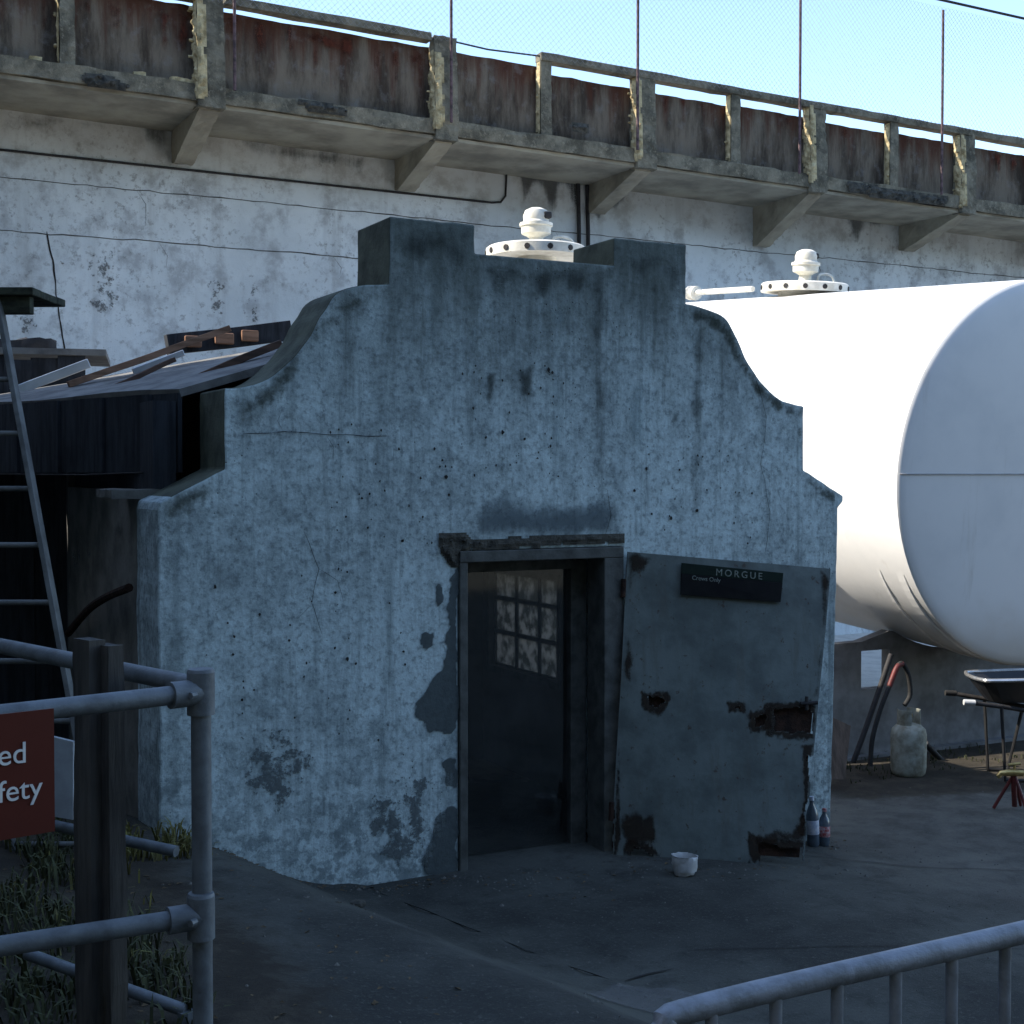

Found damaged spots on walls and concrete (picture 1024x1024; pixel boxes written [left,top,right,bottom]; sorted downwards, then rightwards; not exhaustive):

crack [0,230,358,348]
crack [305,534,343,633]
peeling [415,532,625,734]